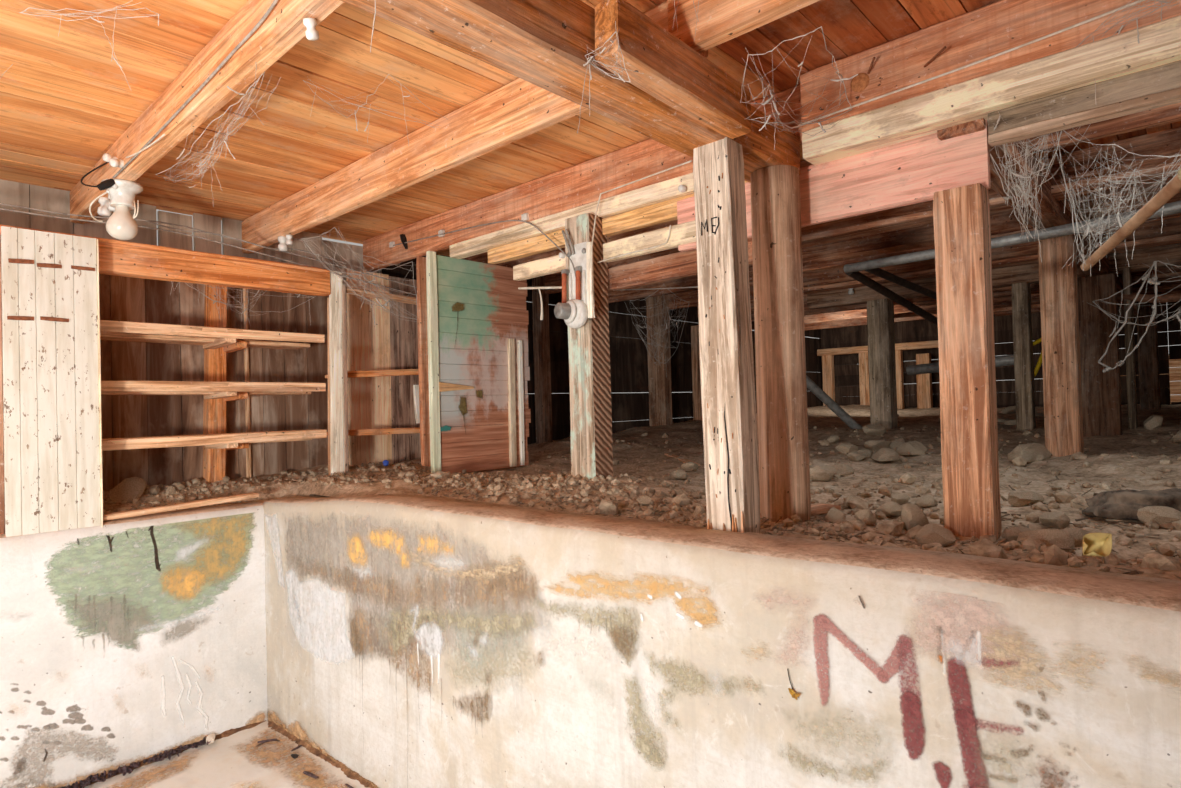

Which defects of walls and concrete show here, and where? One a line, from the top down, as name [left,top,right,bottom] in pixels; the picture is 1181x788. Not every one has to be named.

damp [266,516,637,721]
damp [625,657,705,765]